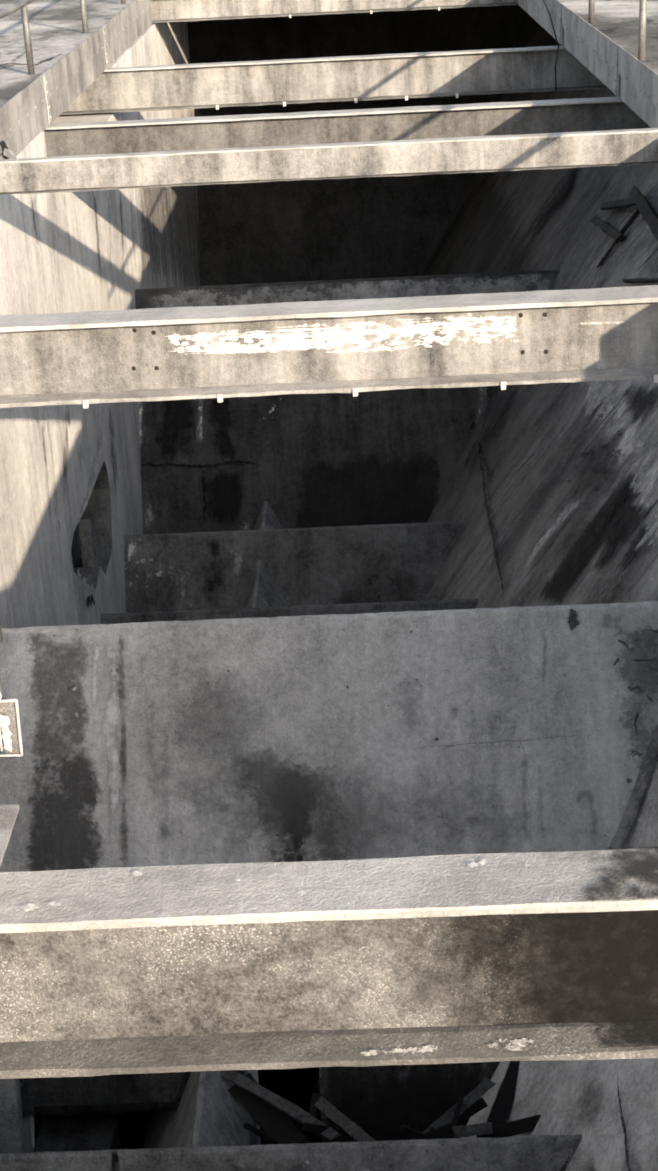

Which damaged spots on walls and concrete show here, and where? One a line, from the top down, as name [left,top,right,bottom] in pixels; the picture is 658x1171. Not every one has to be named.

leakage [296,453,439,528]
crack [441,442,538,604]
leakage [528,383,658,602]
leakage [29,635,126,871]
leakage [241,751,343,862]
crack [617,1074,630,1171]